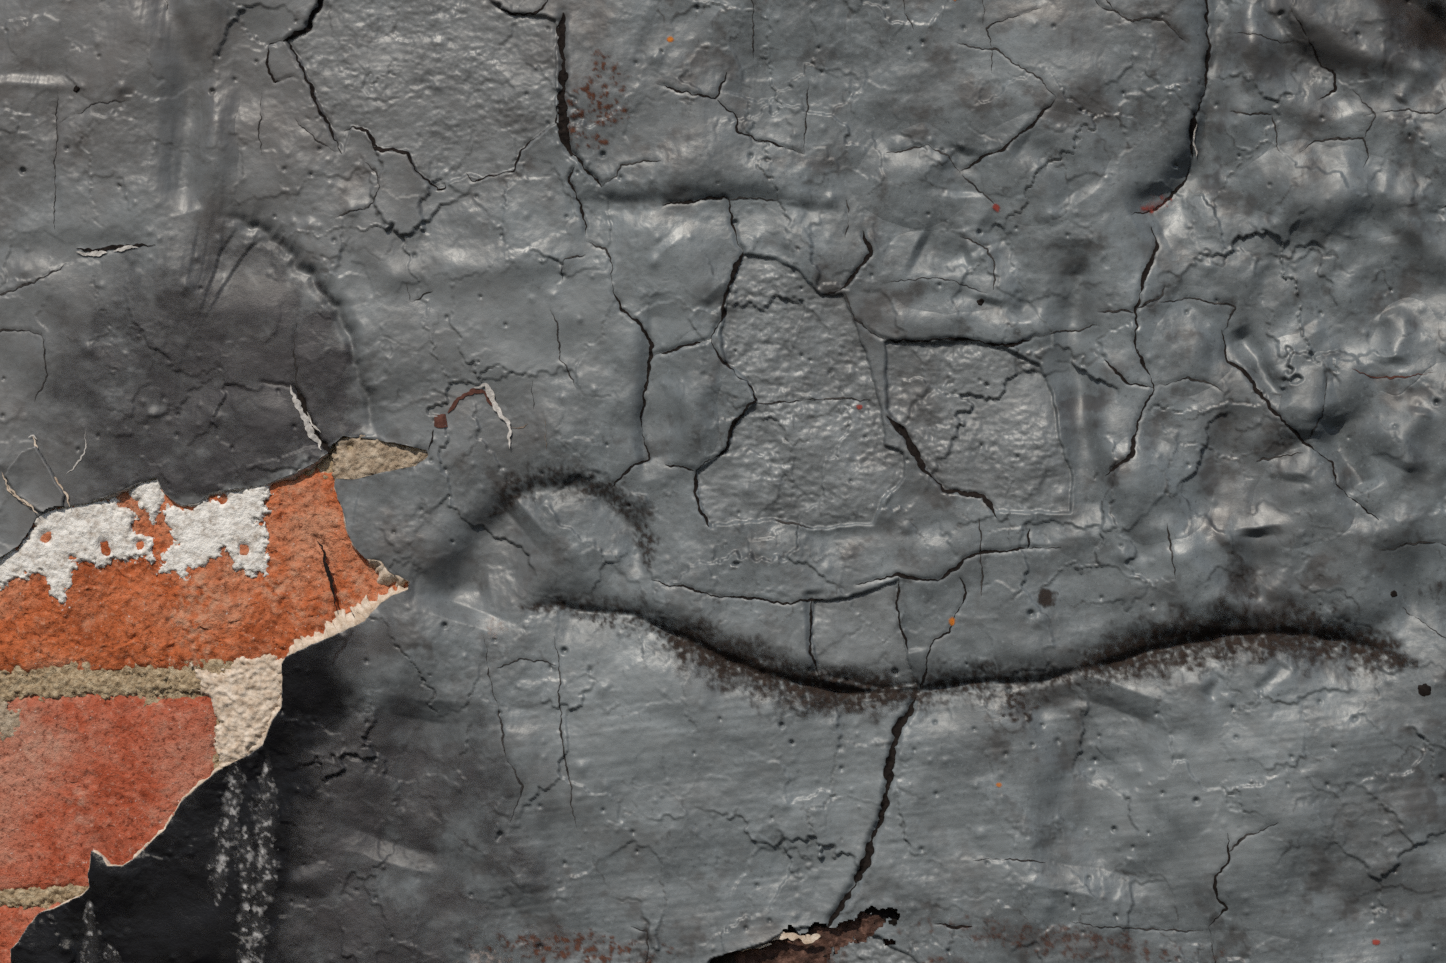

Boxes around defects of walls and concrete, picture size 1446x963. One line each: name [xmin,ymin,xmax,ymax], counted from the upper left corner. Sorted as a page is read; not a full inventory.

crack [53,99,127,229]
crack [0,264,64,401]
crack [823,0,1446,550]
crack [66,431,86,474]
crack [258,0,1059,927]
crack [1167,525,1176,579]
peeling [0,383,512,956]
water stain [664,618,910,713]
water stain [1079,602,1407,679]
spalling [710,906,916,963]
crack [934,922,972,930]
crack [1073,822,1278,963]